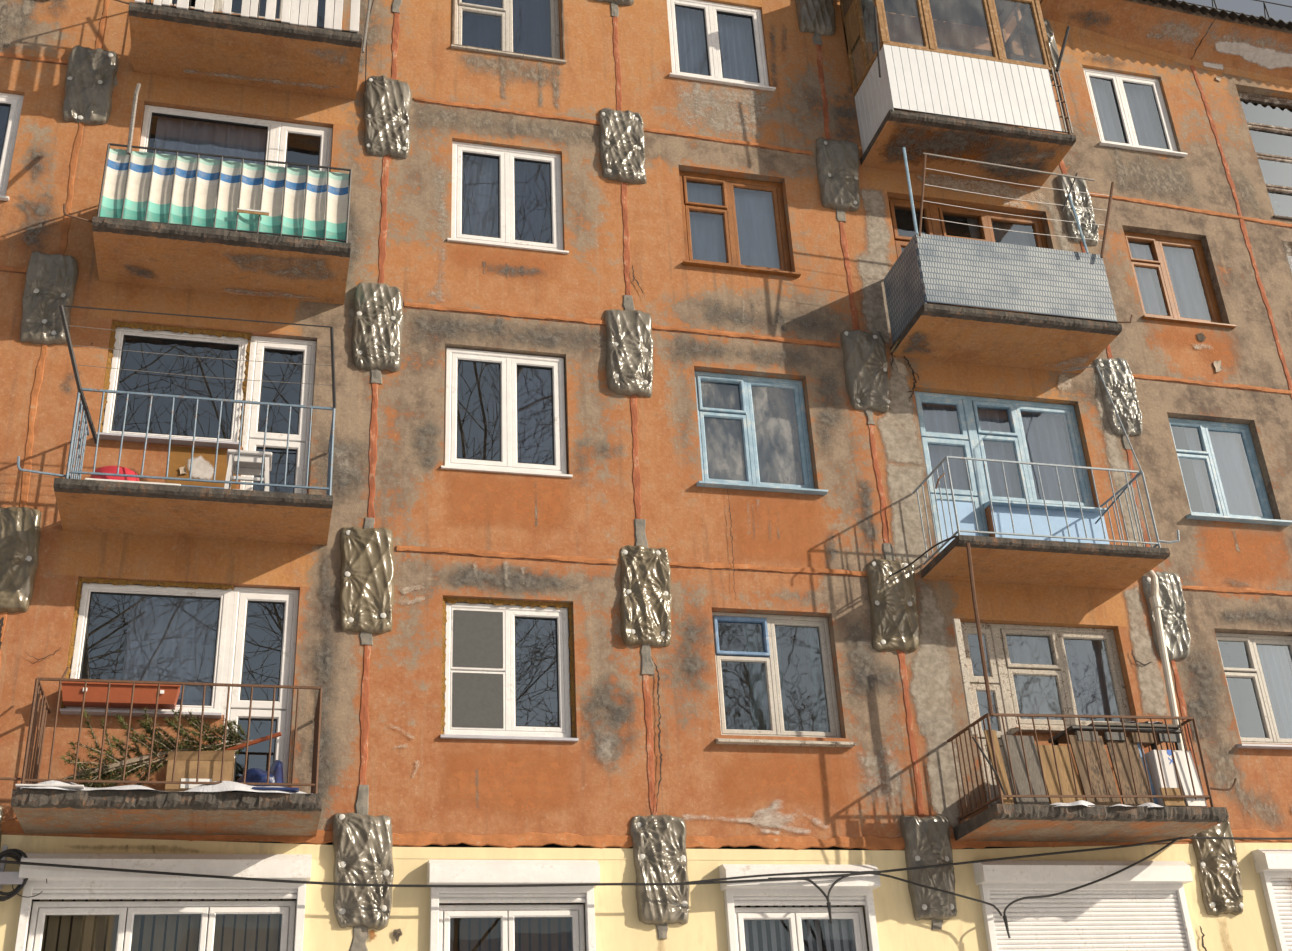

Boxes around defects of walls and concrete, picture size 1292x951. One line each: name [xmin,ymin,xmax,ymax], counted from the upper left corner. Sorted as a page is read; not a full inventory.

leakage [464,54,559,107]
peeling [1203,41,1292,82]
crack [0,617,61,664]
leakage [312,557,335,802]
flaking render [910,585,963,827]
crack [651,657,663,812]
peeling [732,803,821,834]